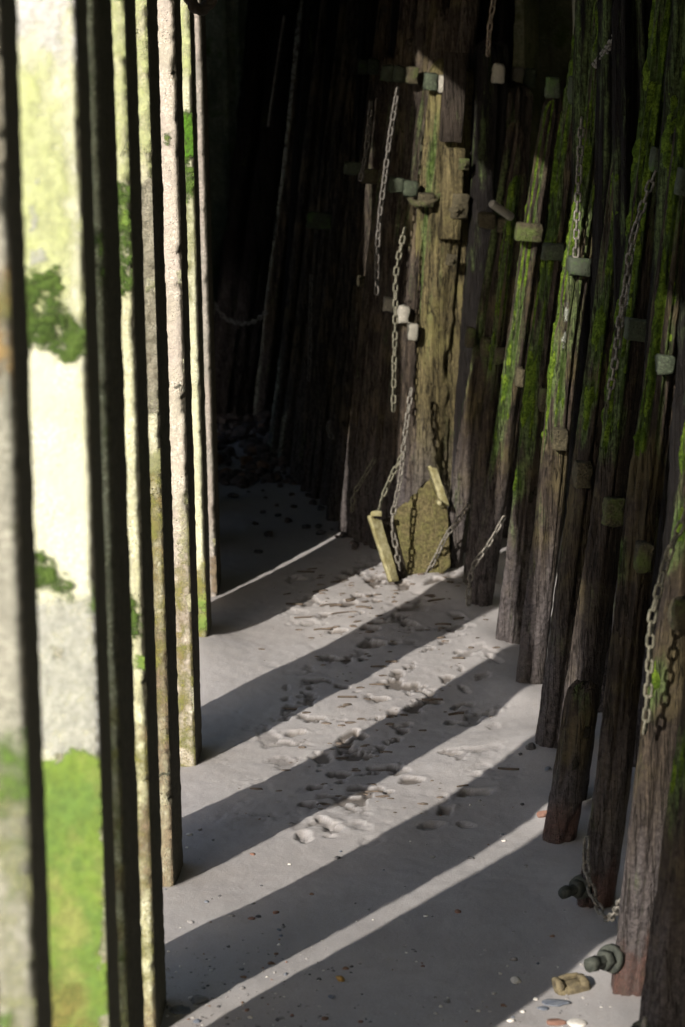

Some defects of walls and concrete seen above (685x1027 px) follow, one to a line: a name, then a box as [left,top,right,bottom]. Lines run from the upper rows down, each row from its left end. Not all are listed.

damp [52,985,80,1027]